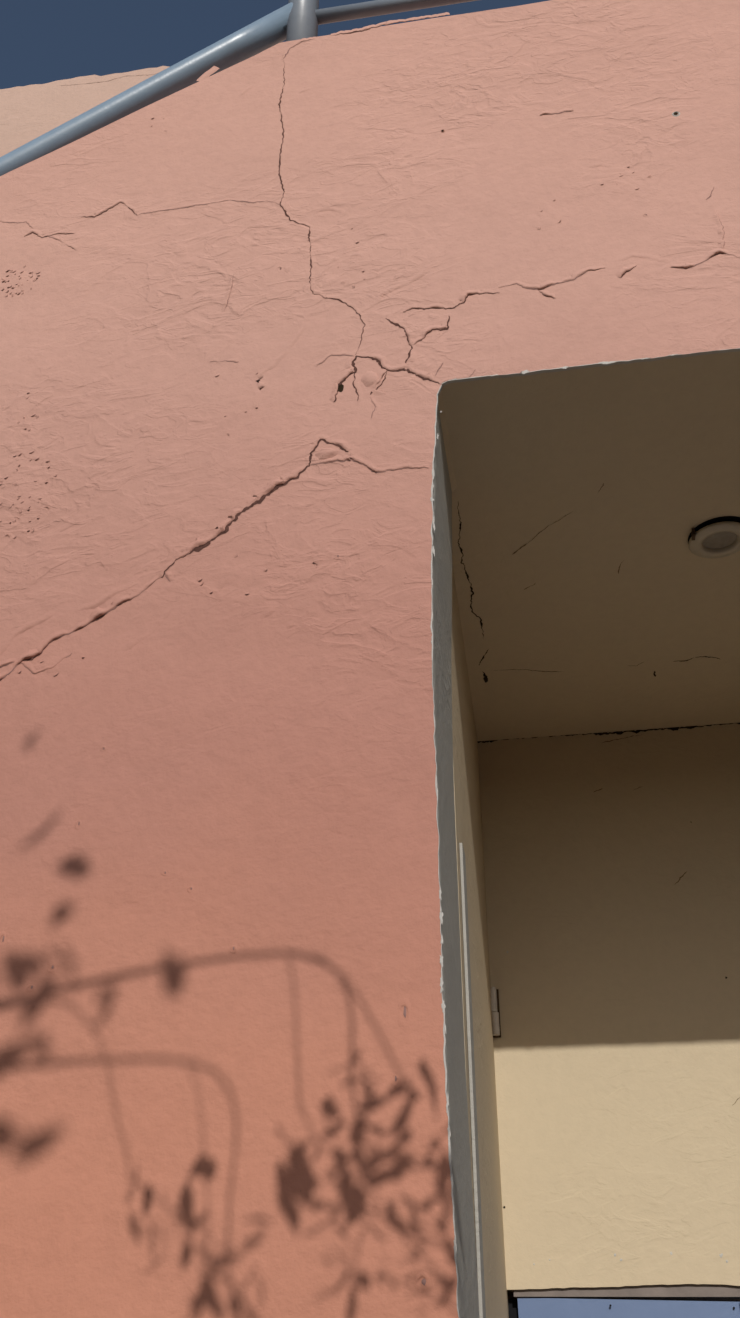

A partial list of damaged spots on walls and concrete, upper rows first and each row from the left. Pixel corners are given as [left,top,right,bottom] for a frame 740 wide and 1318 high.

crack [0,12,636,419]
crack [671,187,740,269]
crack [0,434,430,680]
crack [457,503,557,683]
crack [477,723,740,743]